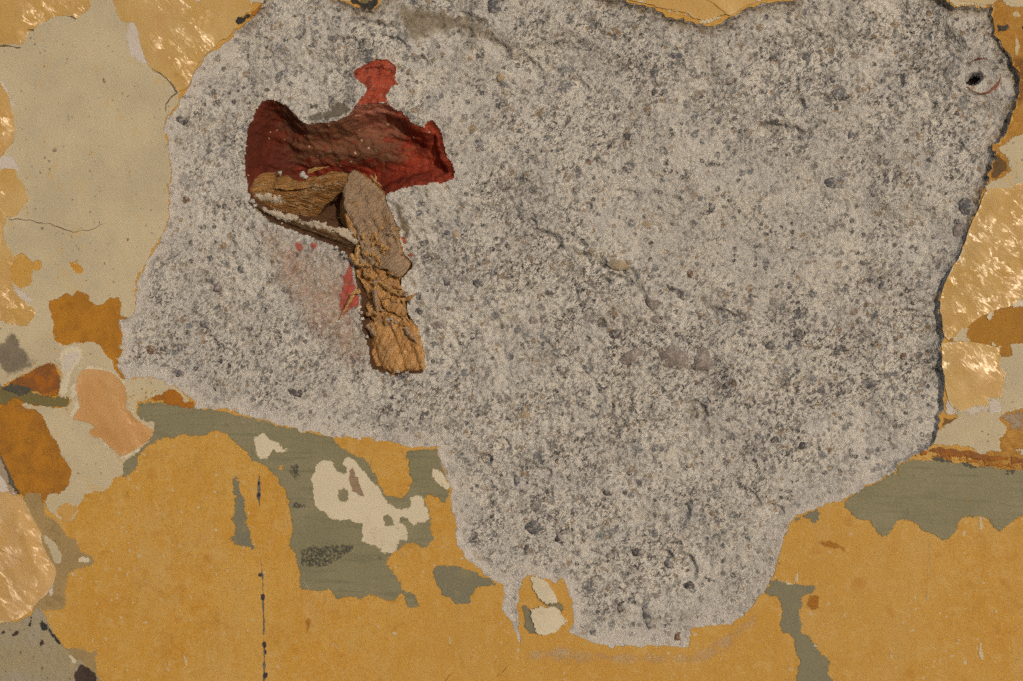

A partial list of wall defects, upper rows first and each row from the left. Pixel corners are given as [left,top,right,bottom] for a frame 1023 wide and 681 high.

peeling [0,0,92,45]
peeling [109,0,262,92]
spalling [244,59,455,215]
peeling [0,79,38,326]
spalling [298,194,345,229]
peeling [940,182,1023,340]
spalling [354,265,393,375]
peeling [58,345,154,462]
peeling [941,341,1007,415]
peeling [0,457,101,681]
spalling [525,520,544,534]
peeling [522,576,568,636]